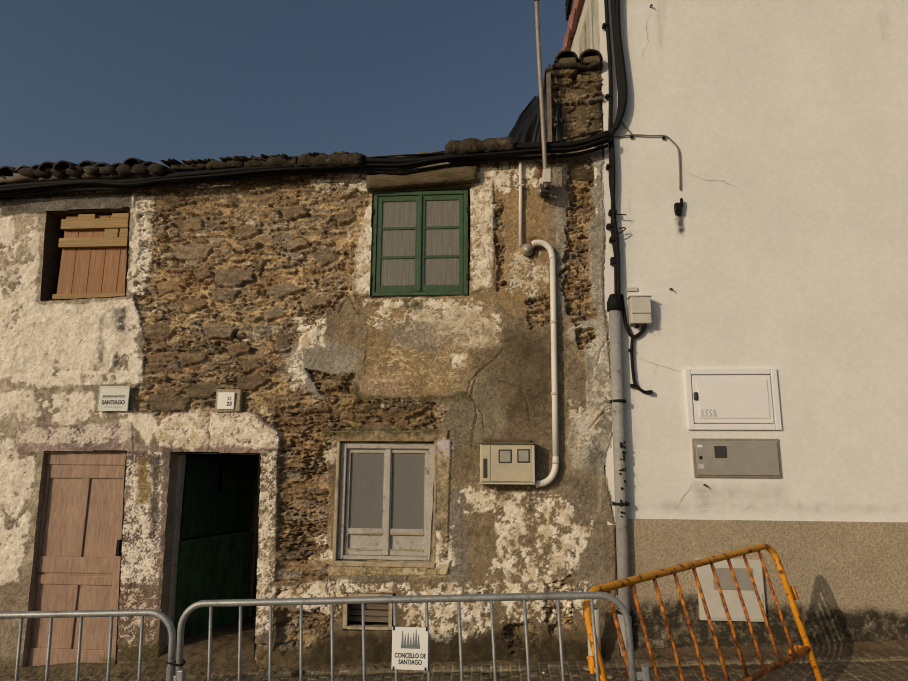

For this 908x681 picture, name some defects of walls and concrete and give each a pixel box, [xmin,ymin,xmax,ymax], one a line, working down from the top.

peeling [0,157,612,654]
crack [468,350,531,441]
leakage [632,597,908,649]